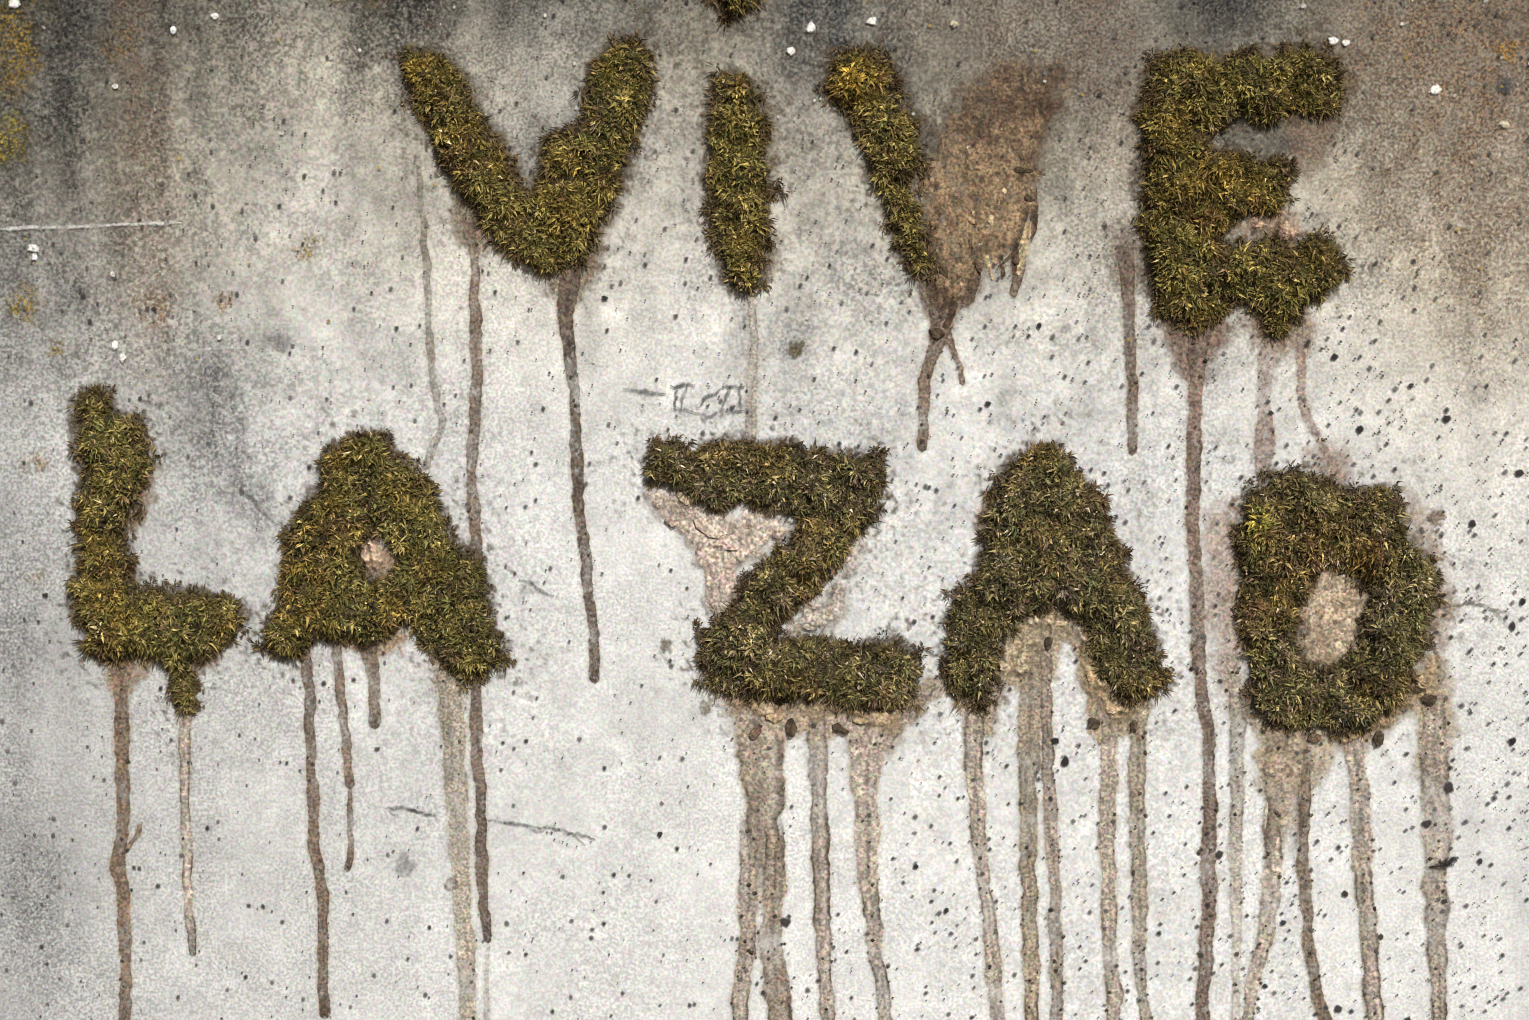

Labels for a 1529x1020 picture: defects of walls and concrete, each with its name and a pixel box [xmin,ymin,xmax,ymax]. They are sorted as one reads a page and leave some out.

water stain [462,218,485,561]
water stain [556,250,601,683]
water stain [106,658,142,1020]
water stain [301,648,331,1018]
water stain [331,639,381,872]
water stain [436,670,492,1020]
water stain [730,687,933,1020]
water stain [1016,636,1067,1020]
water stain [1095,688,1154,1020]
water stain [1184,319,1333,1020]
water stain [1342,734,1385,1020]
water stain [1419,653,1457,1020]